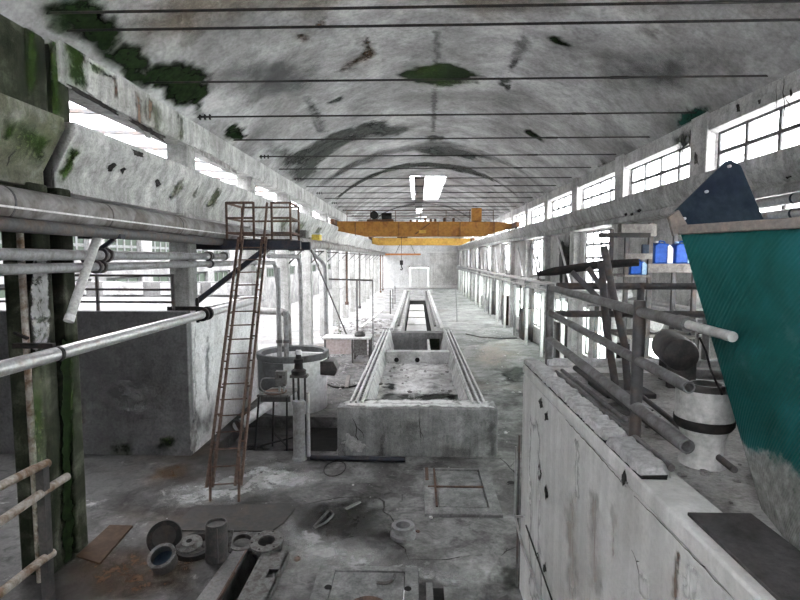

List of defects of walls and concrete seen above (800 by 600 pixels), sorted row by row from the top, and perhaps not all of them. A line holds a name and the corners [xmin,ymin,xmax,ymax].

water stain [144,0,248,31]
water stain [458,0,531,10]
water stain [268,121,408,182]
water stain [332,92,512,198]